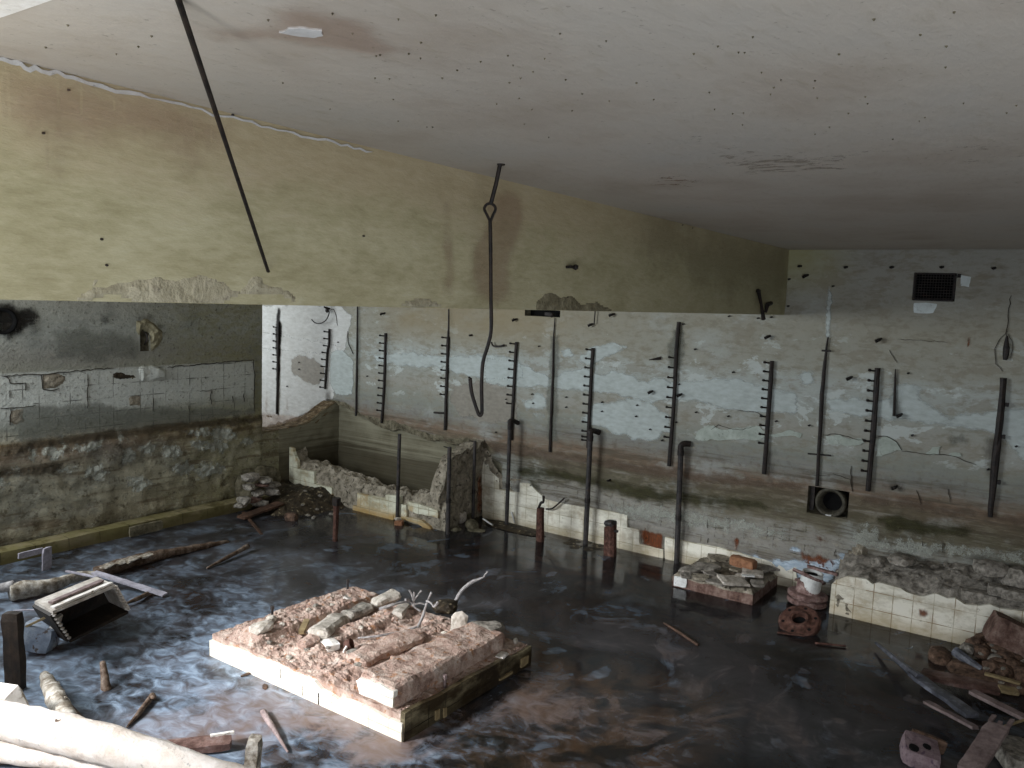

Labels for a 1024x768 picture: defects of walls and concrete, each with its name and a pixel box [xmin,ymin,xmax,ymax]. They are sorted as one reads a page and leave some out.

crack [0,57,372,153]
flaking render [536,293,612,311]
flaking render [43,373,65,389]
peeling [77,275,471,445]
peeling [374,343,802,441]
crack [826,434,976,465]
peeling [826,385,1024,460]
corrosion [641,530,662,548]